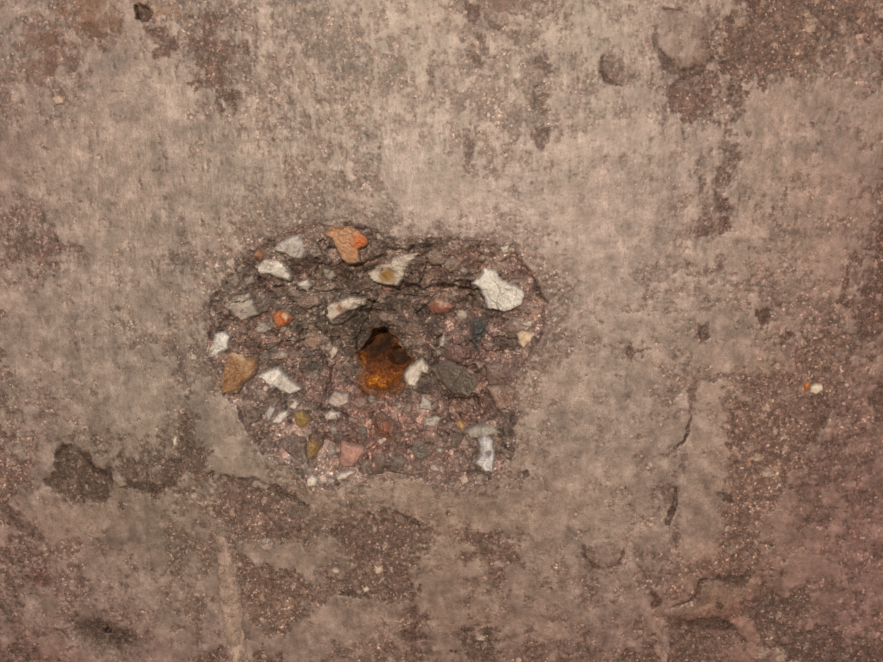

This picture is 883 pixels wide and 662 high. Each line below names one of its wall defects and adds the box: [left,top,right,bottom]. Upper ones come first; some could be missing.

spalling [206,219,548,490]
corrosion [356,327,415,398]
crack [674,417,692,449]
crack [660,487,678,526]